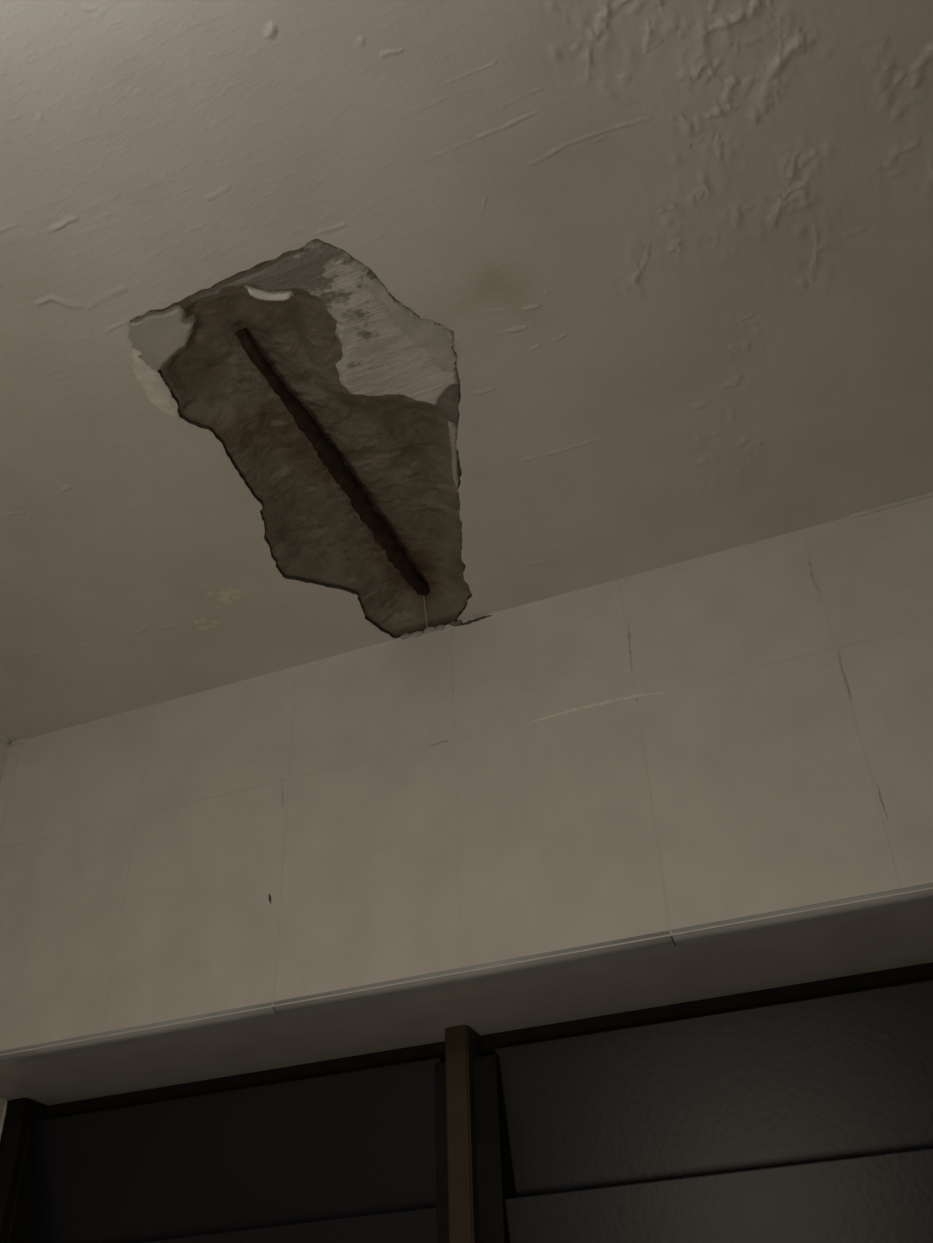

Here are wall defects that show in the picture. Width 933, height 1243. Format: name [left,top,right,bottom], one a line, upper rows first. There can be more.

spalling [127,238,472,639]